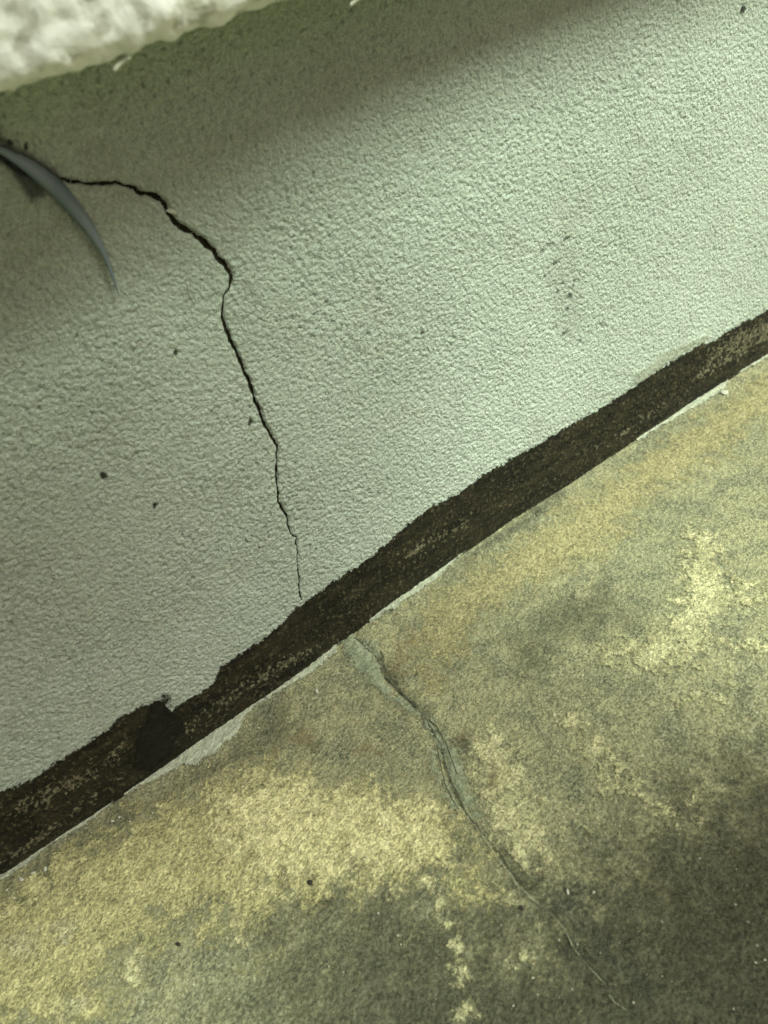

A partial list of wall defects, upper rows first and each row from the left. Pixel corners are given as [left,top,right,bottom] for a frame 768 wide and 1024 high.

crack [59,177,302,600]
crack [338,634,640,1024]